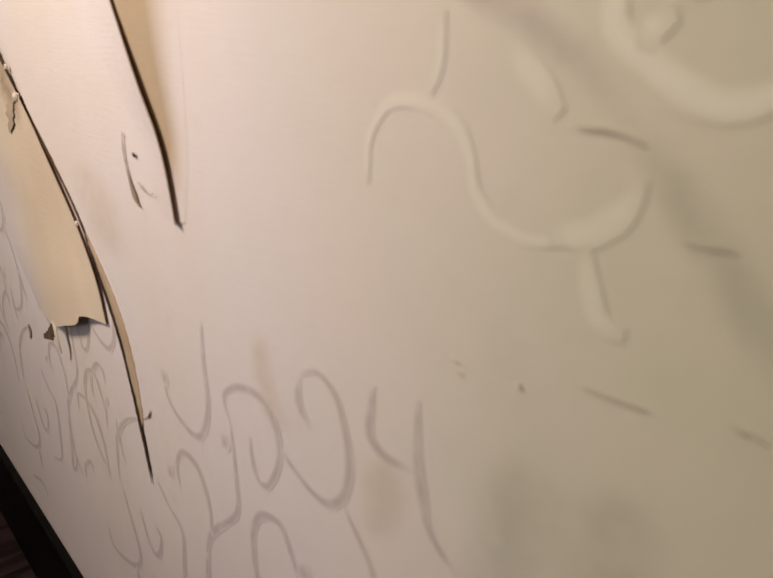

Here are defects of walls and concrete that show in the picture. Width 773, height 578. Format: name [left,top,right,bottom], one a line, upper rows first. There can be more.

flaking render [110,0,188,223]